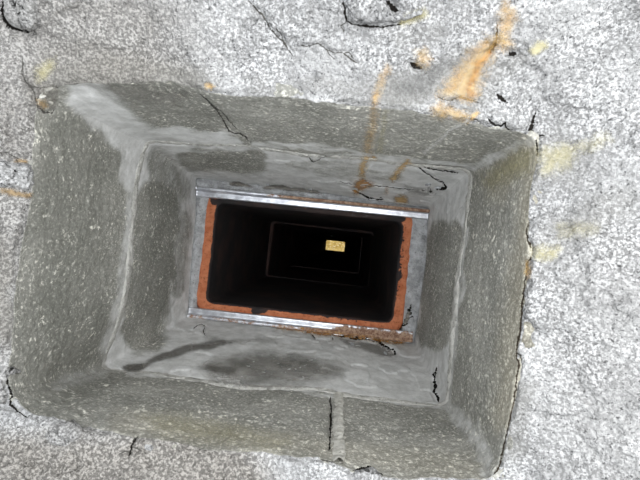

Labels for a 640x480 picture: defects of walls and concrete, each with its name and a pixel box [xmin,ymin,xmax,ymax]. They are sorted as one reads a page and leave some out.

crack [248,0,357,63]
crack [340,2,417,32]
crack [200,94,250,142]
corrosion [353,156,375,194]
crack [340,166,458,200]
leakage [124,341,226,370]
corrosion [288,327,403,344]
crack [494,222,533,474]
crack [6,379,27,418]
crack [432,367,440,402]
crack [321,397,334,463]